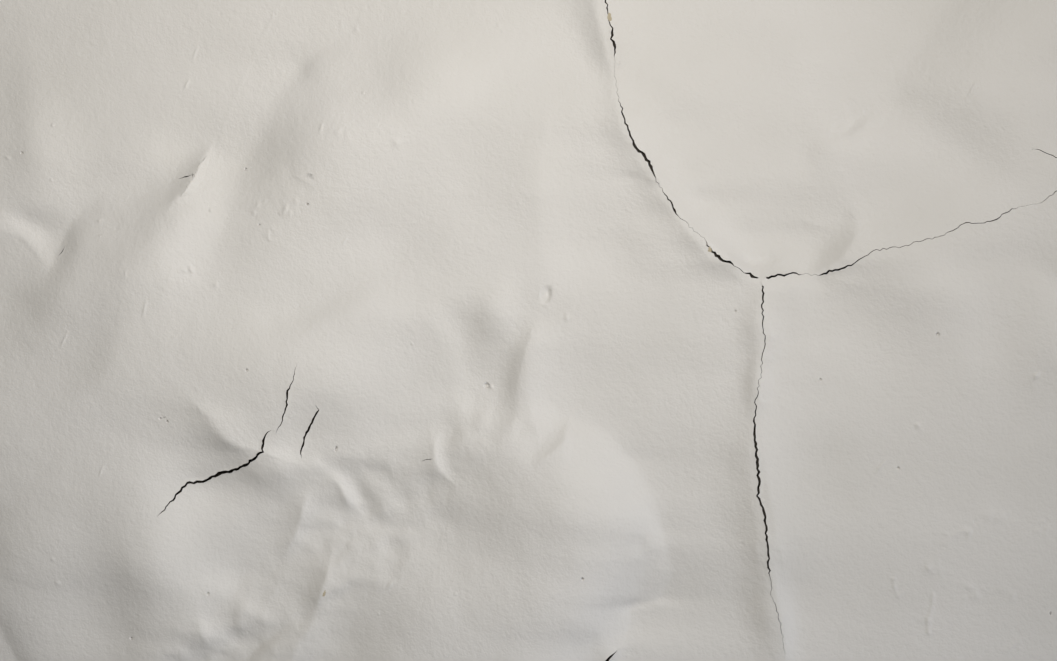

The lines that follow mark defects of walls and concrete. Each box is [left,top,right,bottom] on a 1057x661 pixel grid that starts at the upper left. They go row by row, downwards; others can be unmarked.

crack [153,362,323,520]
crack [600,0,1057,661]